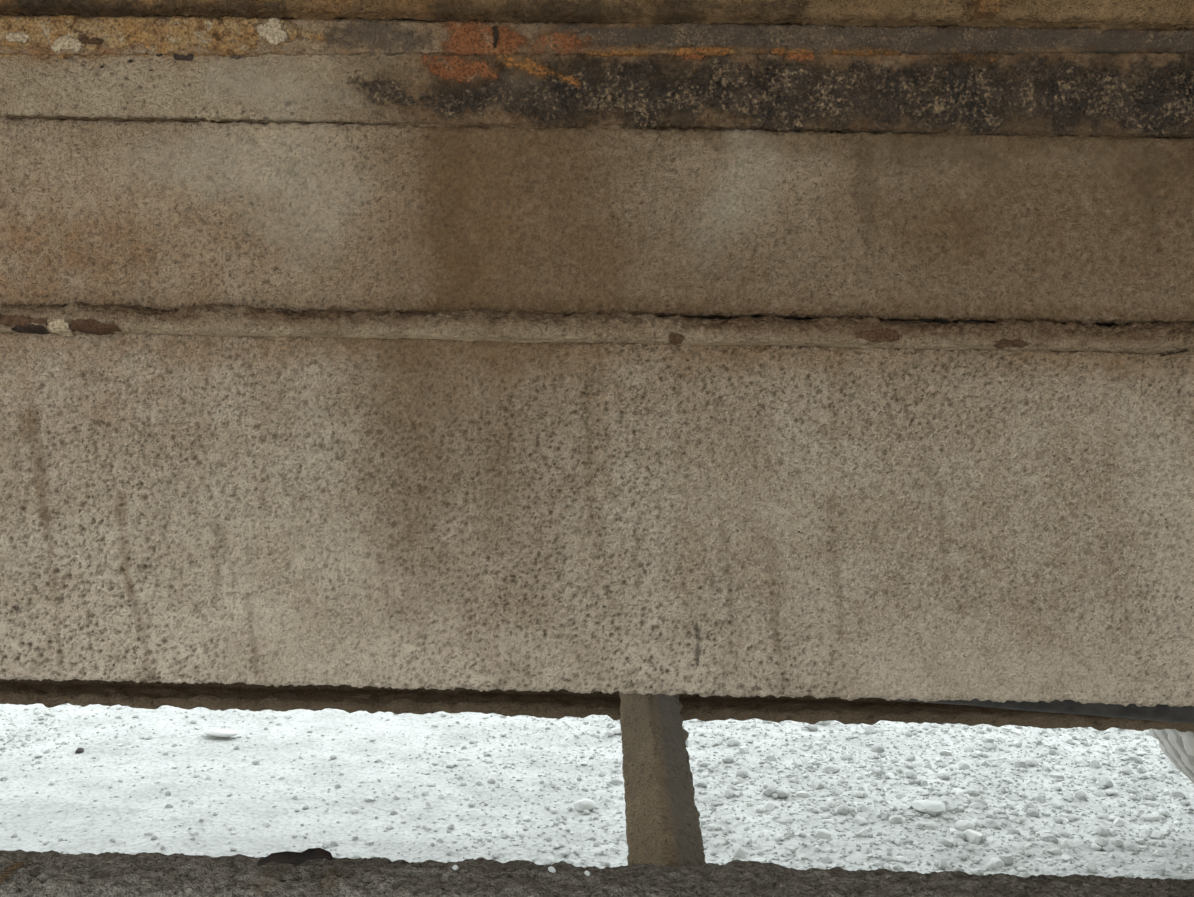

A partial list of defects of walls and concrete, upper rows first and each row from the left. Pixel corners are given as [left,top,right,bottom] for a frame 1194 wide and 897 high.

rust [422,20,737,87]
rust [756,47,899,62]